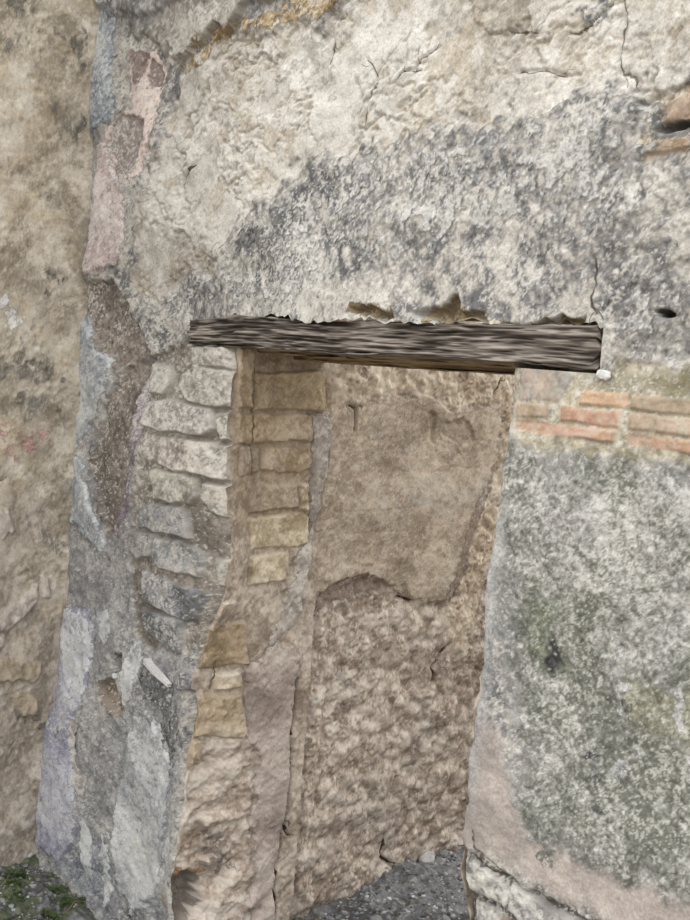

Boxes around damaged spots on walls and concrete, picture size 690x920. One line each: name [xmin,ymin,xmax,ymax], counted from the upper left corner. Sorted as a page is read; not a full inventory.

flaking render [69,0,690,559]
flaking render [240,394,505,920]